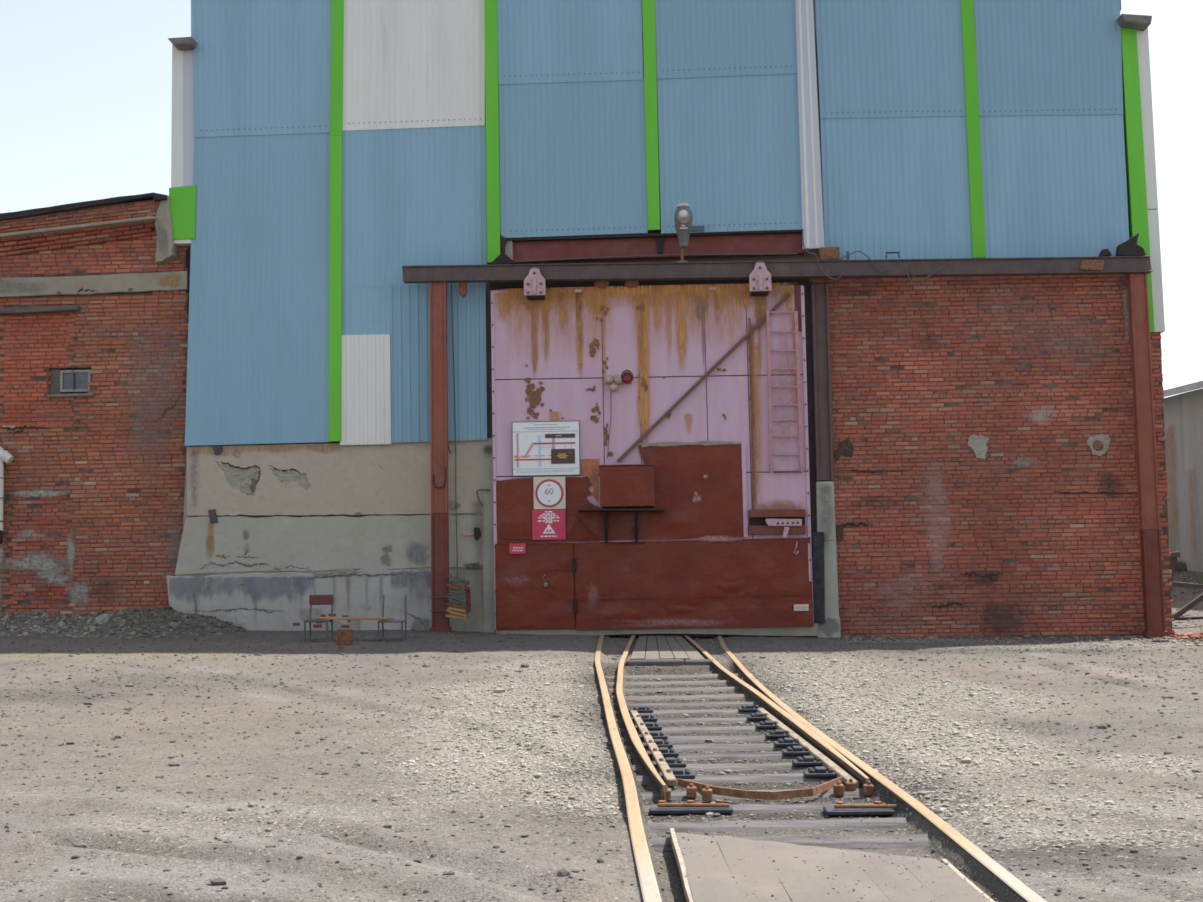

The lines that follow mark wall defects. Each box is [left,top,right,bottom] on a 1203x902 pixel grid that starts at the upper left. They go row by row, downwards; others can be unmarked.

rust [498,283,796,509]
crack [216,461,304,483]
spalling [217,450,311,496]
crack [186,512,427,520]
crack [194,551,283,613]
damp [170,577,307,600]
crack [296,571,424,580]